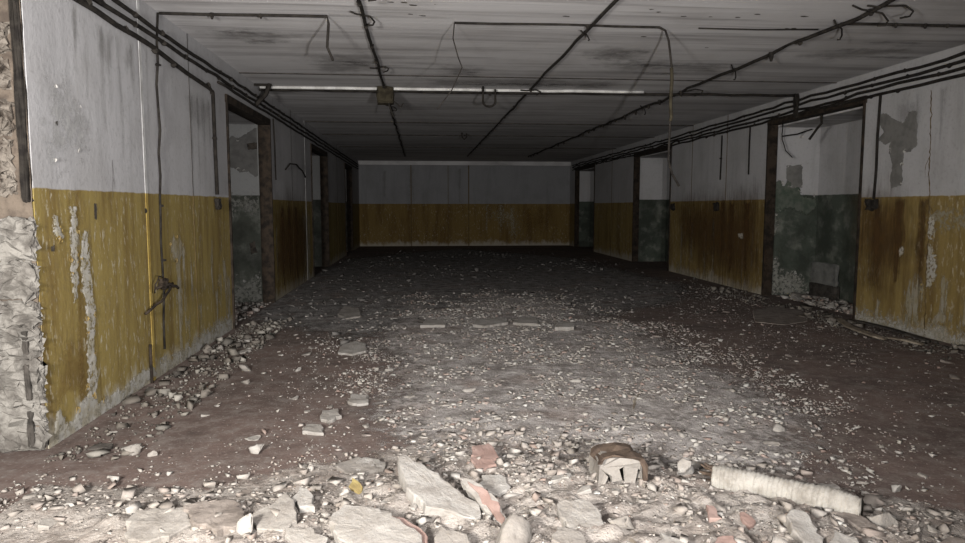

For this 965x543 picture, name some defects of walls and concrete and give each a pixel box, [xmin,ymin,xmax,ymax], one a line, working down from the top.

peeling [229,128,258,177]
peeling [879,111,918,188]
spalling [0,0,98,453]